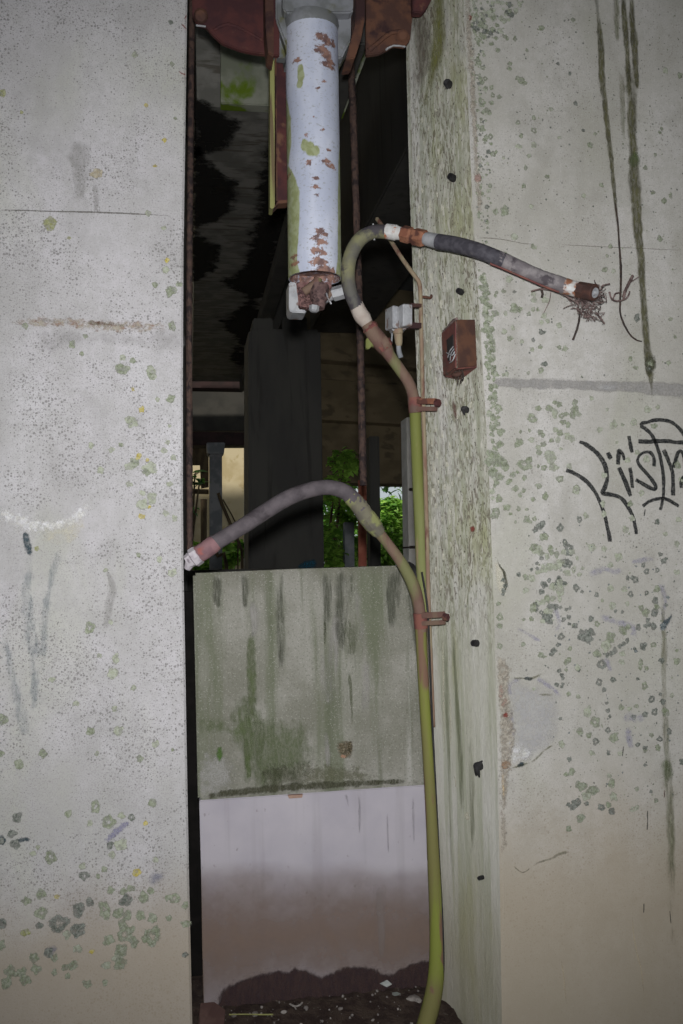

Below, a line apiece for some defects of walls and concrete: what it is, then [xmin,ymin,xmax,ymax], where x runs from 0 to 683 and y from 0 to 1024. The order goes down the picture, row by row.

water stain [495,0,683,396]
rust [29,319,158,331]
water stain [243,586,256,714]
water stain [324,575,355,662]